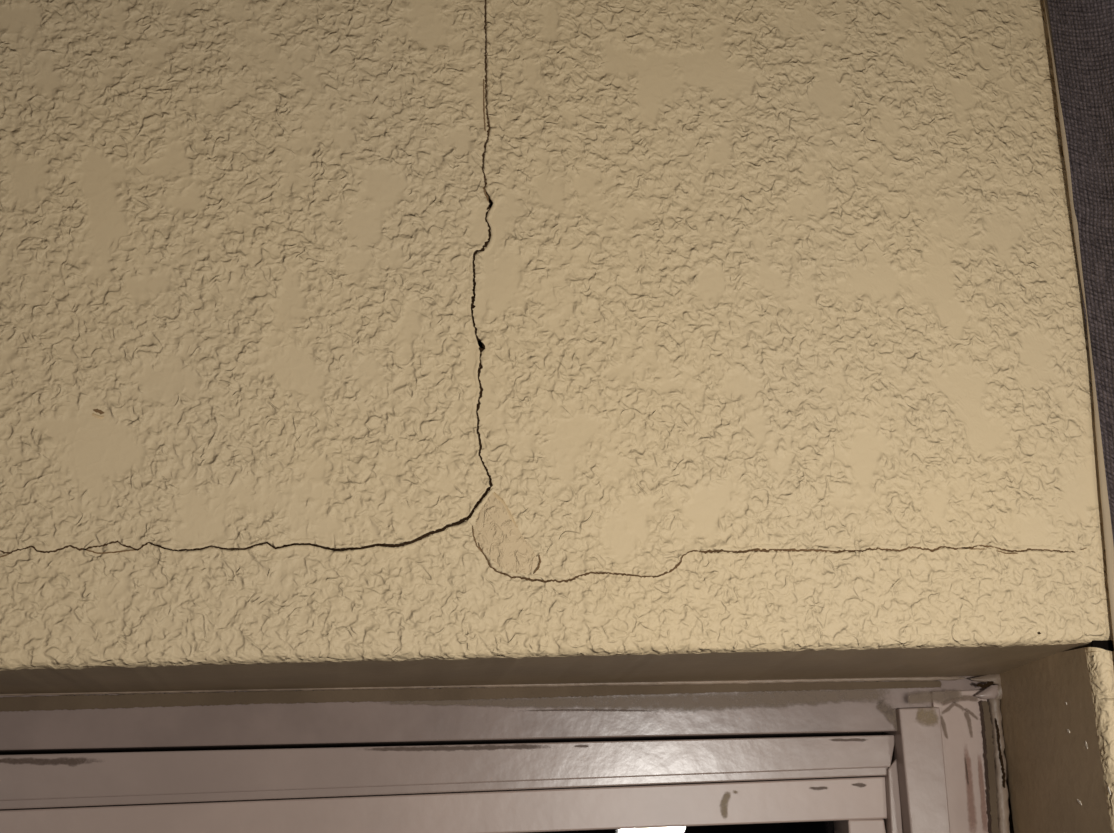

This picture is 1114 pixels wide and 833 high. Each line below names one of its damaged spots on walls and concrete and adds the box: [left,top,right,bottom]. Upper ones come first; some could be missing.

crack [0,0,1086,583]